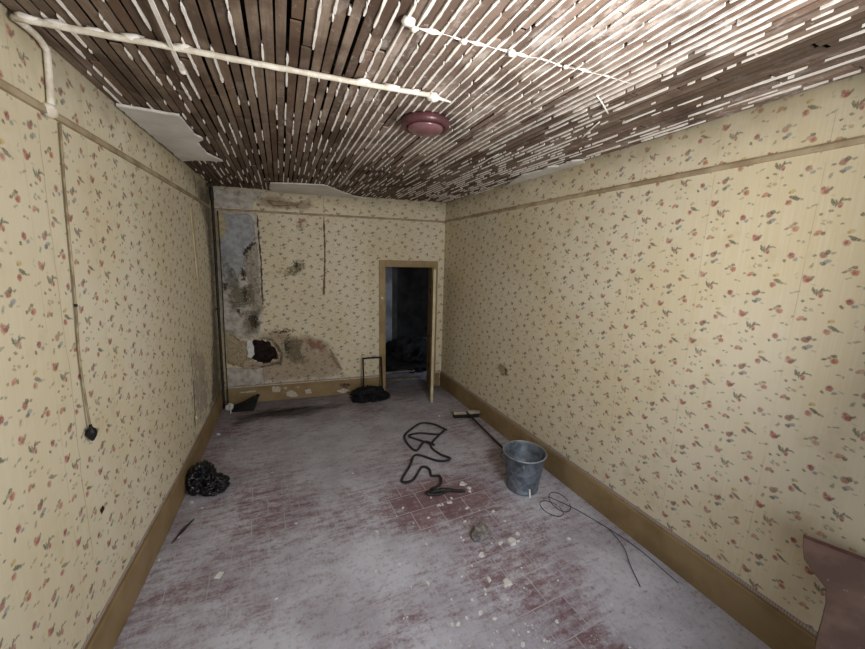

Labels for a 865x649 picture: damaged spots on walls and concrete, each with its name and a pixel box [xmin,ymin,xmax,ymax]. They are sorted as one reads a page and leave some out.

peeling [148,0,186,75]
flaking render [116,103,223,162]
flaking render [269,182,367,199]
flaking render [505,159,585,187]
flaking render [220,214,255,287]
damp [195,183,259,401]
spalling [246,336,282,367]